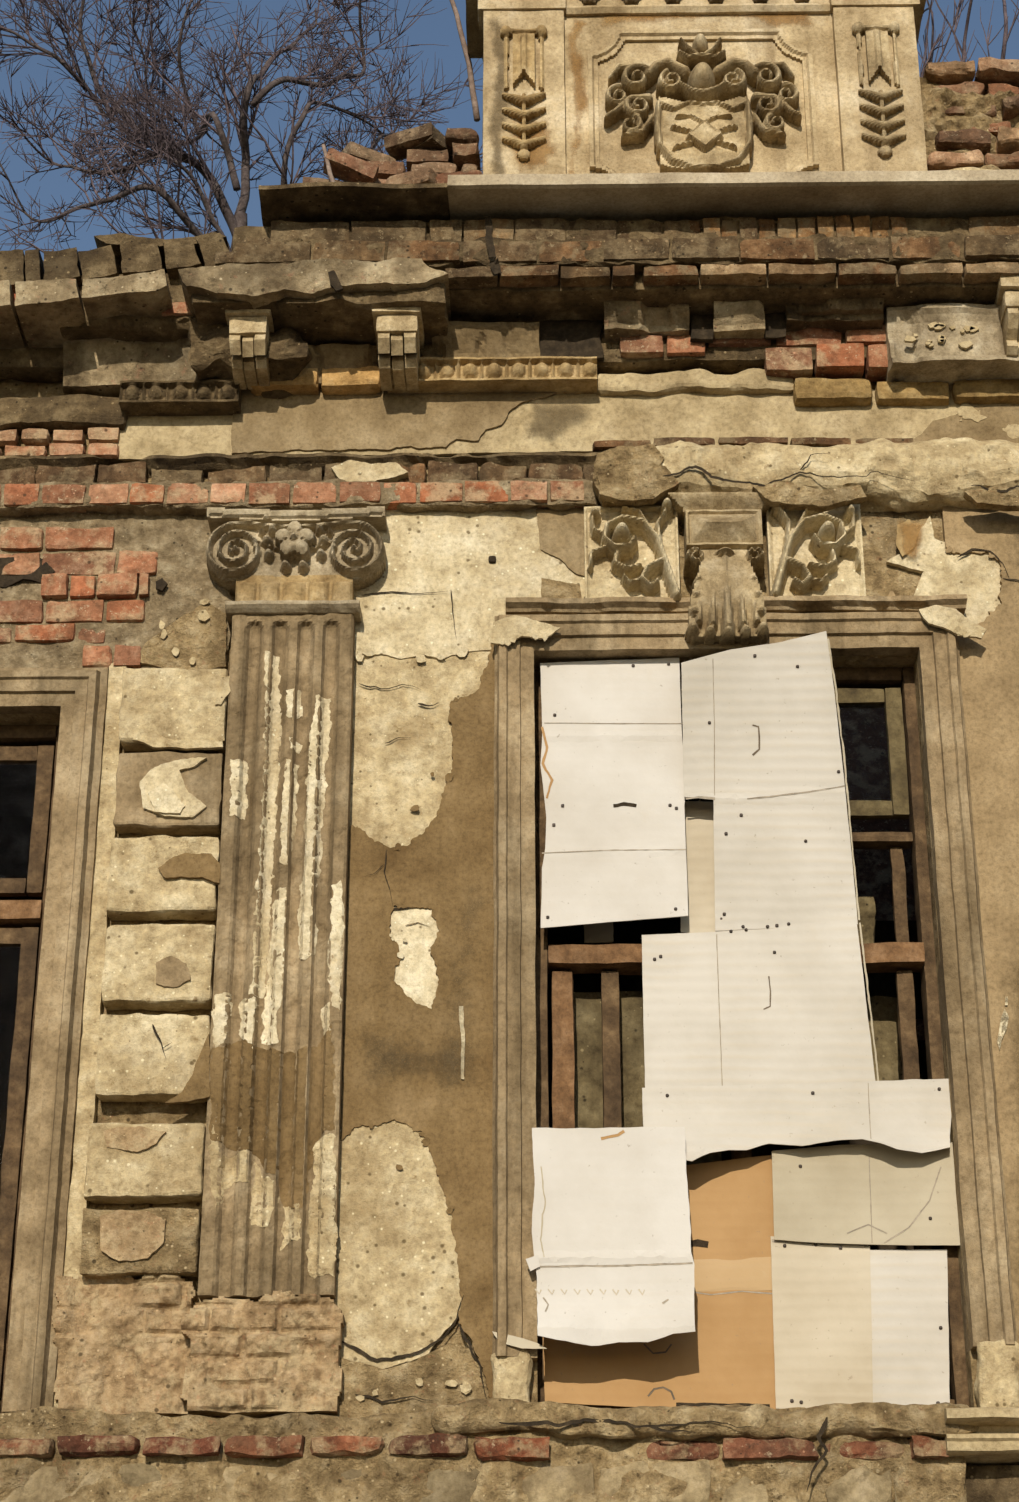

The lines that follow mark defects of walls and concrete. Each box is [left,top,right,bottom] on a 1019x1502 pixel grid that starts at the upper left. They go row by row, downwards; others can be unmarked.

crack [663,453,913,487]
crack [971,484,1019,492]
spalling [0,512,232,706]
peeling [349,403,1019,851]
peeling [133,651,490,1418]
peeling [997,996,1009,1048]